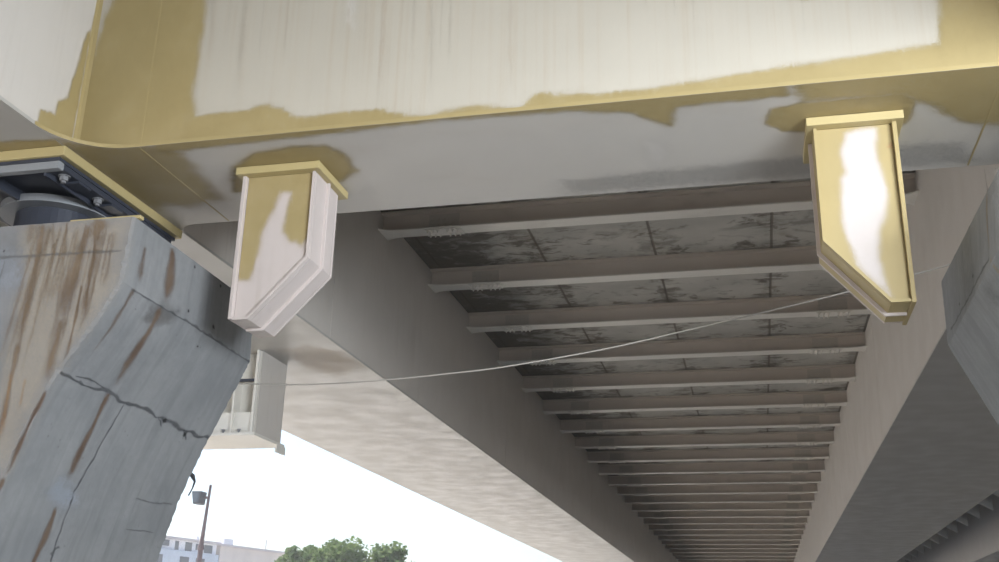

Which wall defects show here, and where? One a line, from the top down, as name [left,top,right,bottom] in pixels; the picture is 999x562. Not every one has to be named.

corrosion [0,219,115,490]
corrosion [116,249,176,383]
corrosion [32,509,56,562]
crack [50,371,209,562]